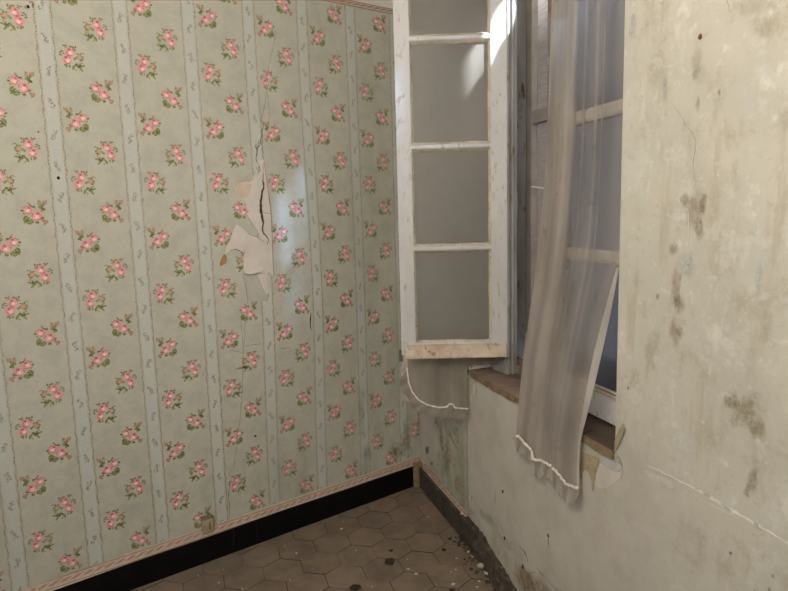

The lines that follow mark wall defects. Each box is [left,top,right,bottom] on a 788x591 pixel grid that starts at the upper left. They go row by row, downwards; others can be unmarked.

crack [256,30,276,245]